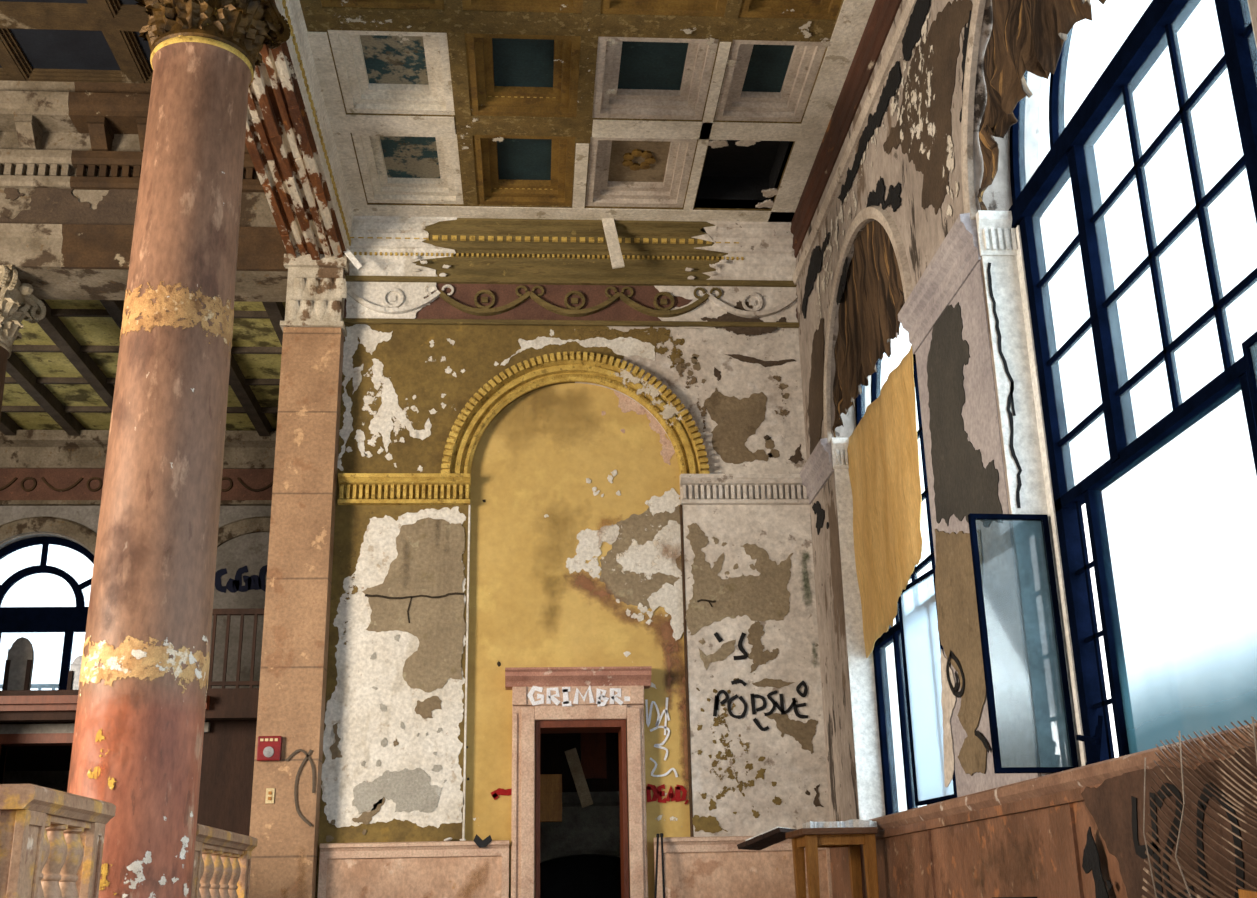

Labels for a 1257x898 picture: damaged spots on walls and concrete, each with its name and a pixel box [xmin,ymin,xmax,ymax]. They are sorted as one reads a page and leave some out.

spalling [0,188,138,225]
peeling [307,0,973,471]
peeling [586,470,621,497]
spalling [812,501,829,535]
spalling [927,302,1003,787]
crack [365,592,464,623]
peeling [79,635,210,700]
peeling [321,506,476,842]
spalling [566,488,795,833]
spalling [766,713,818,754]
spalling [805,784,824,807]
peeling [122,835,189,898]